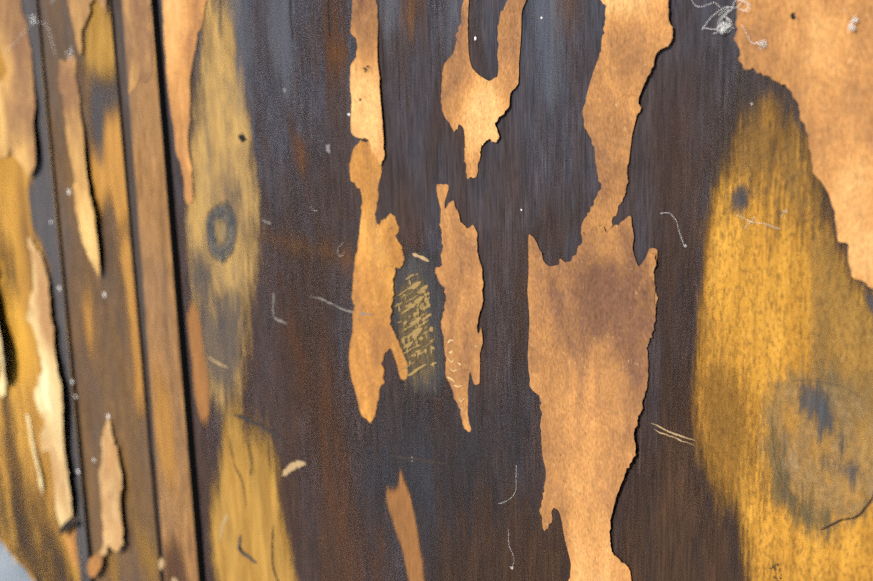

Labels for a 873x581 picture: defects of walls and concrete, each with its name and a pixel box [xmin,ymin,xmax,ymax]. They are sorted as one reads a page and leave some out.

peeling [84,0,115,86]
water stain [733,189,747,210]
peeling [648,253,658,305]
water stain [191,247,243,414]